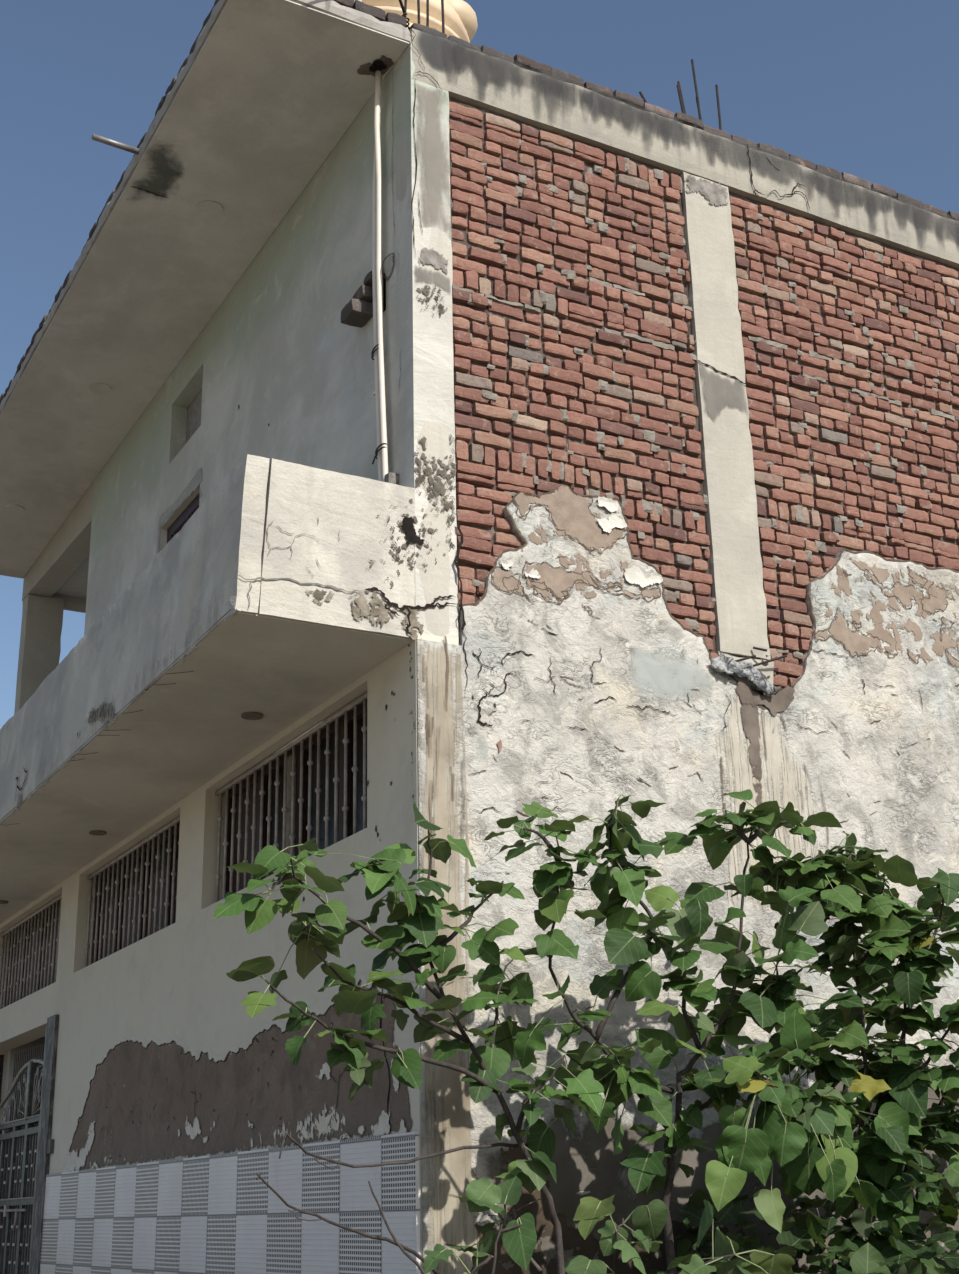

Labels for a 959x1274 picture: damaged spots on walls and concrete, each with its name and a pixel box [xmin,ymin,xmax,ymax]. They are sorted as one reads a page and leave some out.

water stain [417,29,959,243]
spalling [401,516,425,546]
crack [237,516,689,730]
flaking render [462,484,711,660]
flaking render [758,548,959,710]
peeling [63,972,412,1173]